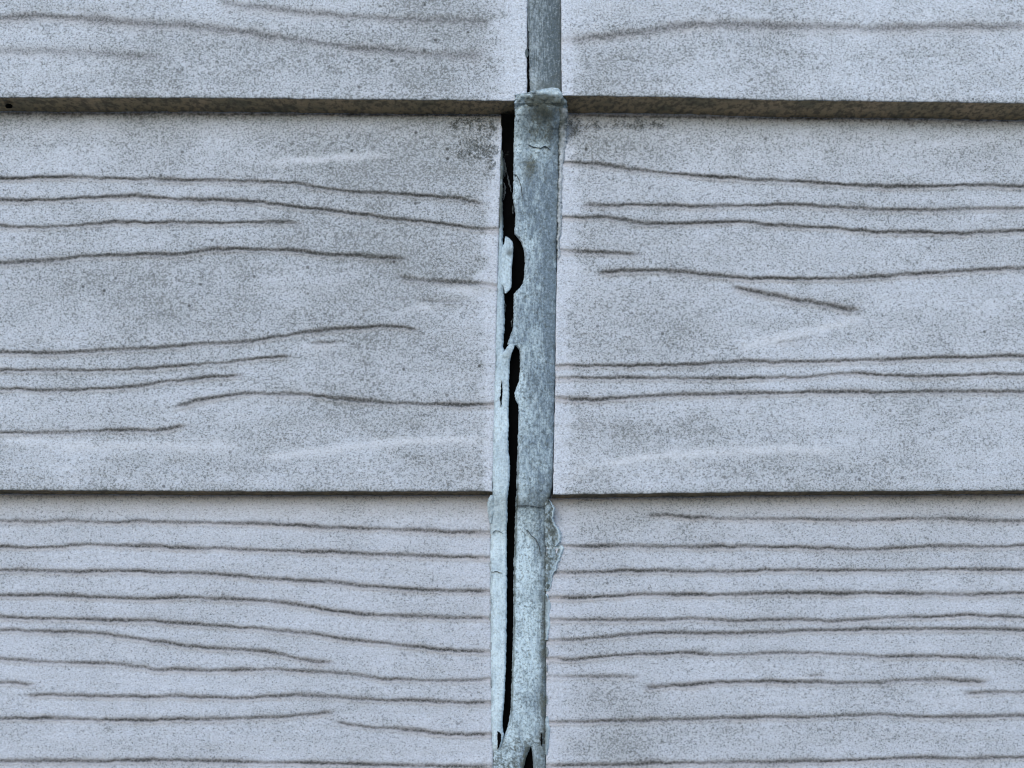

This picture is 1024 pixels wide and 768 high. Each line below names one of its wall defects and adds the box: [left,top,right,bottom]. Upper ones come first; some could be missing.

peeling [500,237,513,293]
peeling [501,344,514,361]
crack [494,114,549,749]
peeling [544,500,564,602]